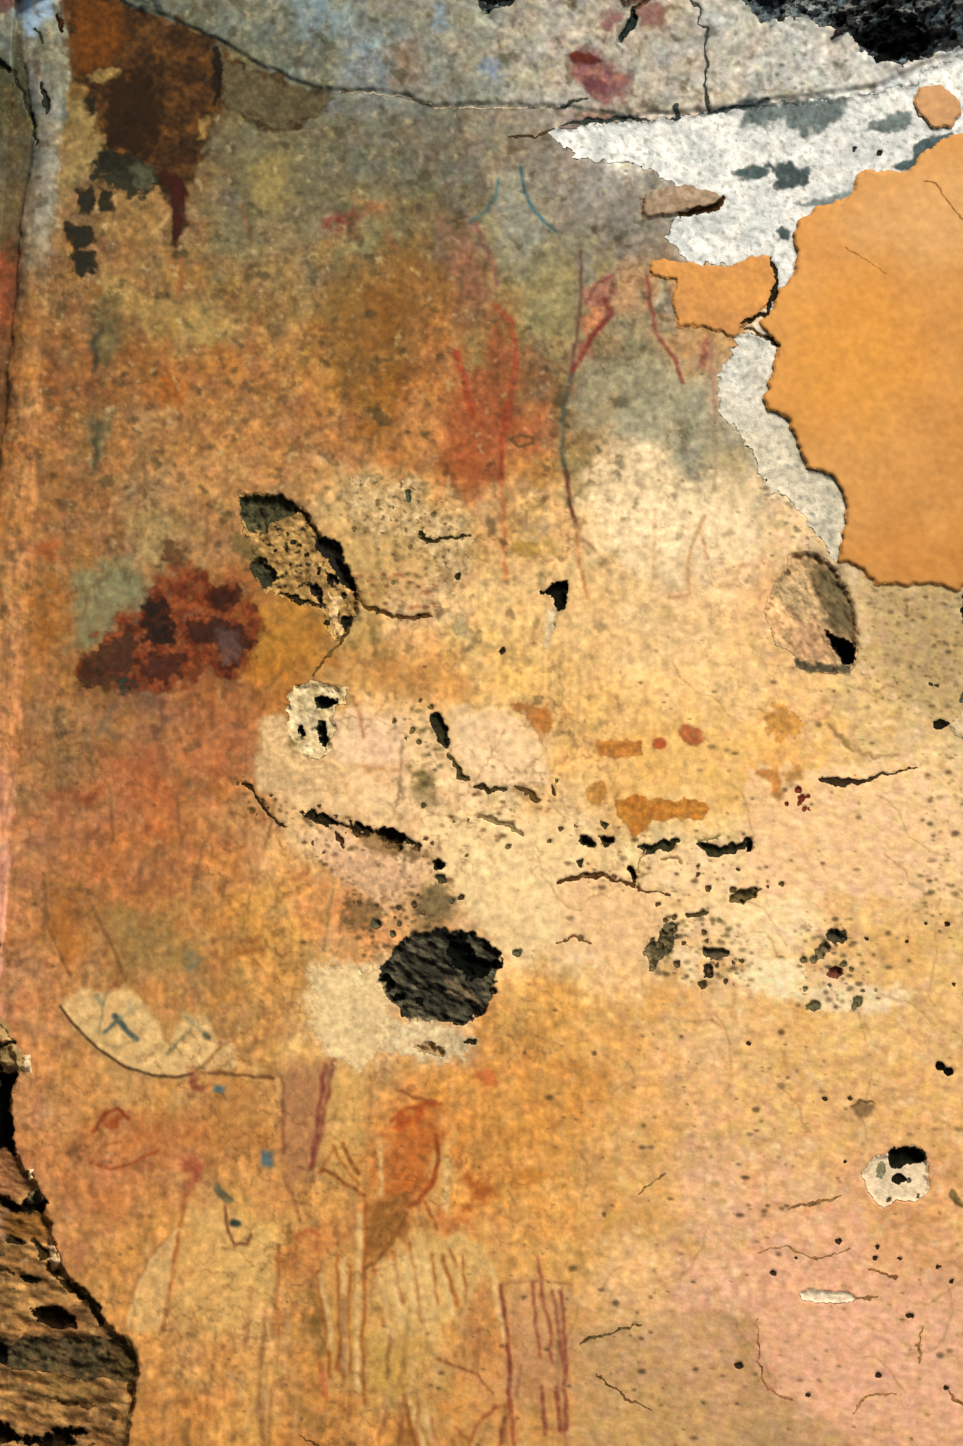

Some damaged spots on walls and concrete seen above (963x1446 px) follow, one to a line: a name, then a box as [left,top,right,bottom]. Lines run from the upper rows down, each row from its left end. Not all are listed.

corrosion [59,0,333,246]
flaking render [548,0,963,310]
flaking render [233,491,358,641]
flaking render [337,474,475,597]
flaking render [717,331,859,674]
flaking render [255,680,349,794]
flaking render [933,694,963,738]
crack [0,1018,17,1079]
flaking render [306,918,523,1073]
flaking render [0,1041,140,1446]
flaking render [862,1145,930,1208]